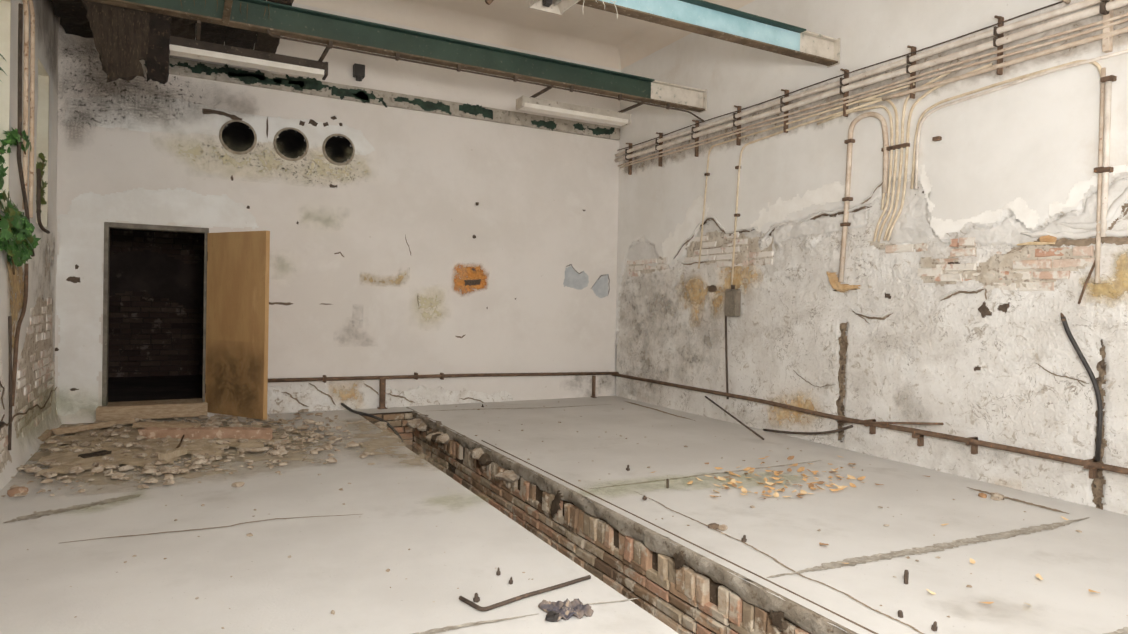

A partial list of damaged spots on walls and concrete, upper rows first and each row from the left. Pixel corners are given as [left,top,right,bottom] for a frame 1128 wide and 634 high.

damp [61,49,203,127]
peeling [170,61,493,119]
peeling [531,120,557,131]
peeling [573,123,615,136]
damp [1087,254,1128,298]
flaking render [563,165,1128,515]
flaking render [0,295,55,473]
crack [0,381,57,430]
crack [3,494,142,523]
crack [62,514,359,543]
crack [583,460,1089,634]
crack [412,614,537,634]